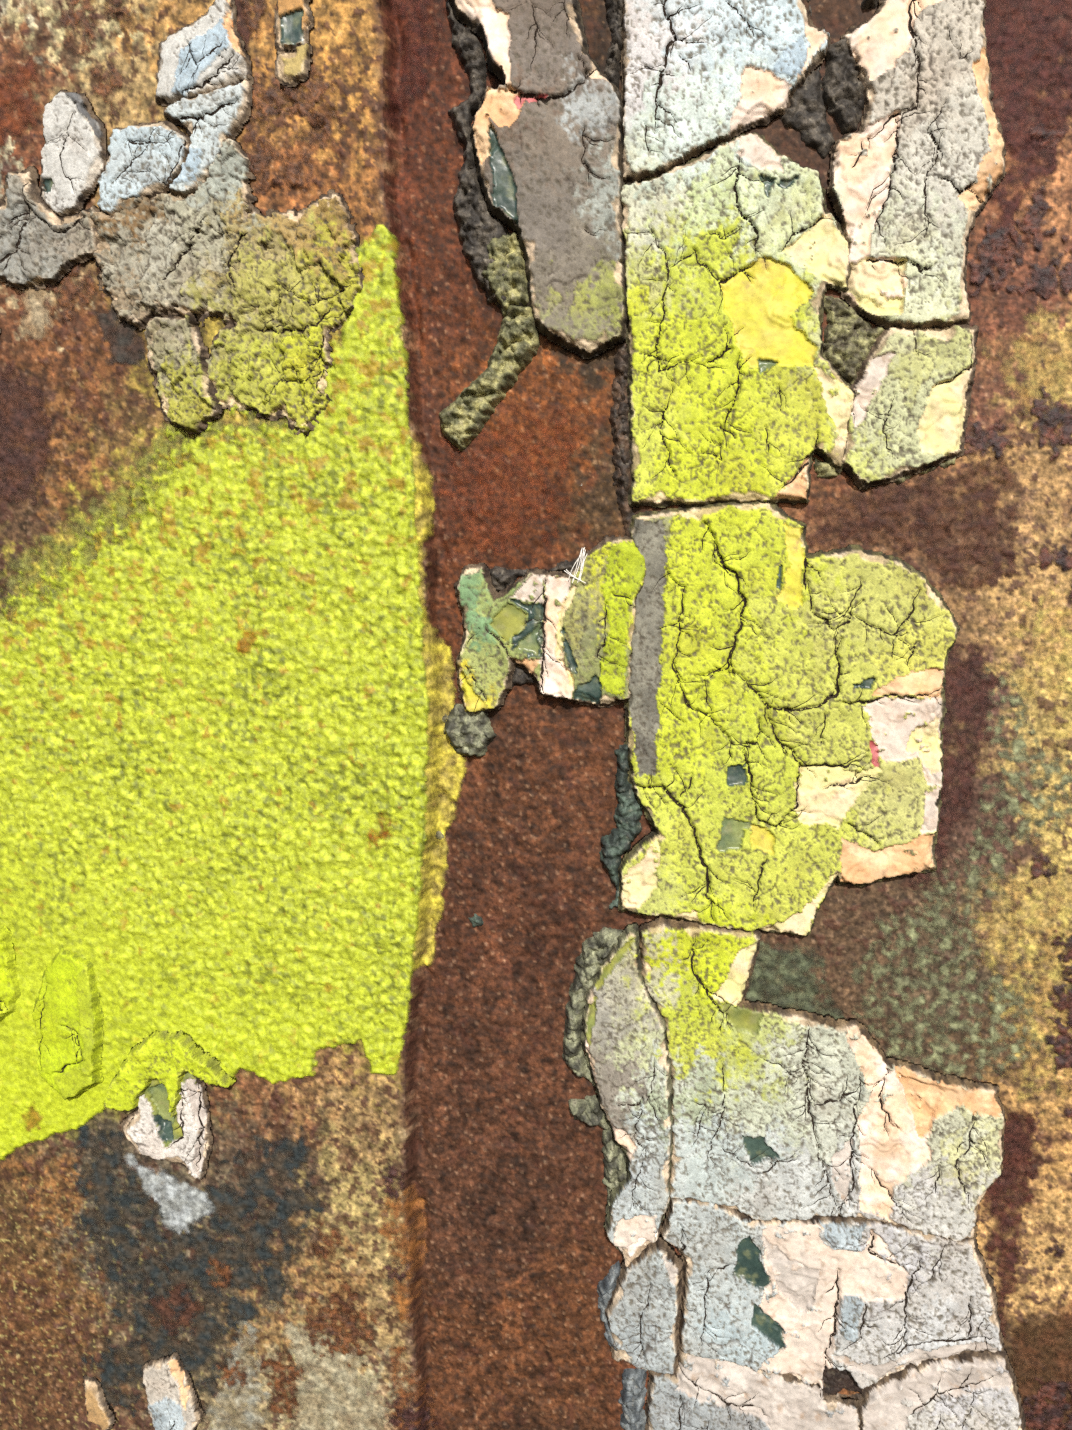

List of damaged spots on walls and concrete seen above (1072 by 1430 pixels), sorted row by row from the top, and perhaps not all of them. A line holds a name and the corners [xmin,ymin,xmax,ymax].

peeling [0,0,365,437]
corrosion [970,0,1072,299]
corrosion [807,386,1072,588]
peeling [444,0,1026,1430]
corrosion [912,644,997,889]
peeling [0,925,237,1180]
corrosion [1045,930,1072,1069]
peeling [83,1374,117,1430]
peeling [141,1351,206,1430]
corrosion [217,1352,304,1419]
corrosion [306,1275,377,1367]
corrosion [985,1110,1072,1430]